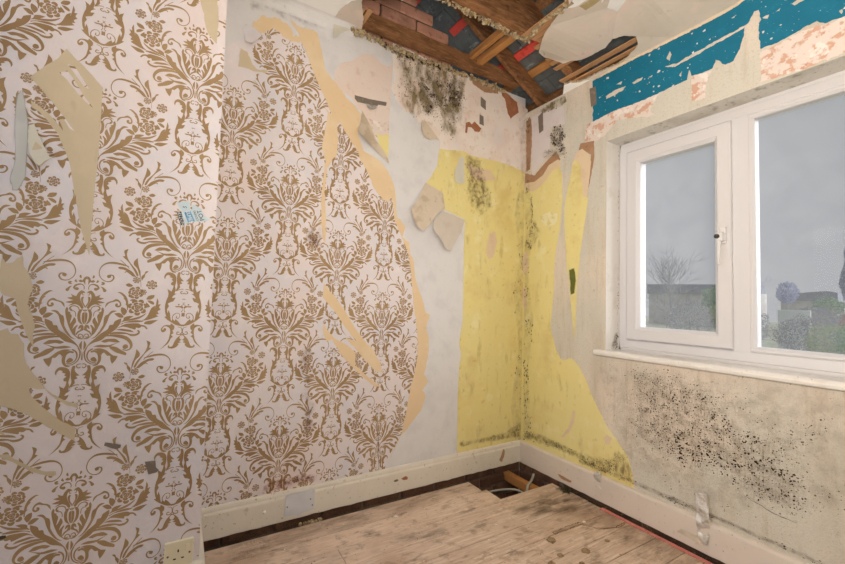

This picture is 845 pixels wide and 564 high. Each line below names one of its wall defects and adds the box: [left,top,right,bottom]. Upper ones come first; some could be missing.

flaking render [335,0,364,30]
water stain [383,41,466,140]
flaking render [334,43,565,192]
flaking render [574,66,674,197]
flaking render [539,0,740,101]
flaking render [759,7,845,82]
water stain [624,367,845,521]